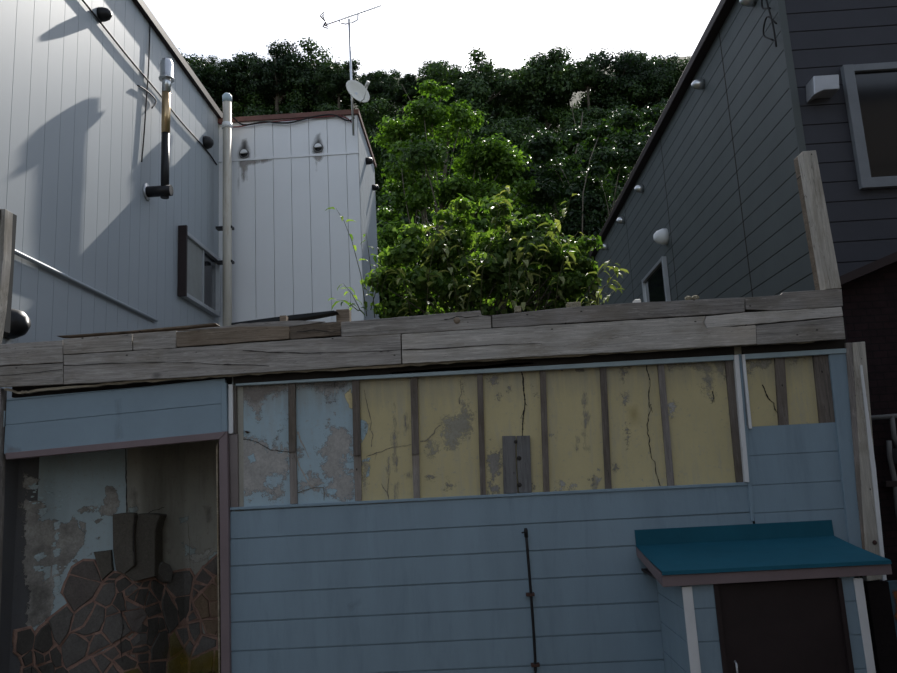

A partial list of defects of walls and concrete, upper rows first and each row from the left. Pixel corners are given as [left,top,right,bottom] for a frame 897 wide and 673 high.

peeling [237,381,370,503]
crack [364,390,441,500]
crack [520,372,528,436]
crack [646,365,660,485]
peeling [18,473,120,627]